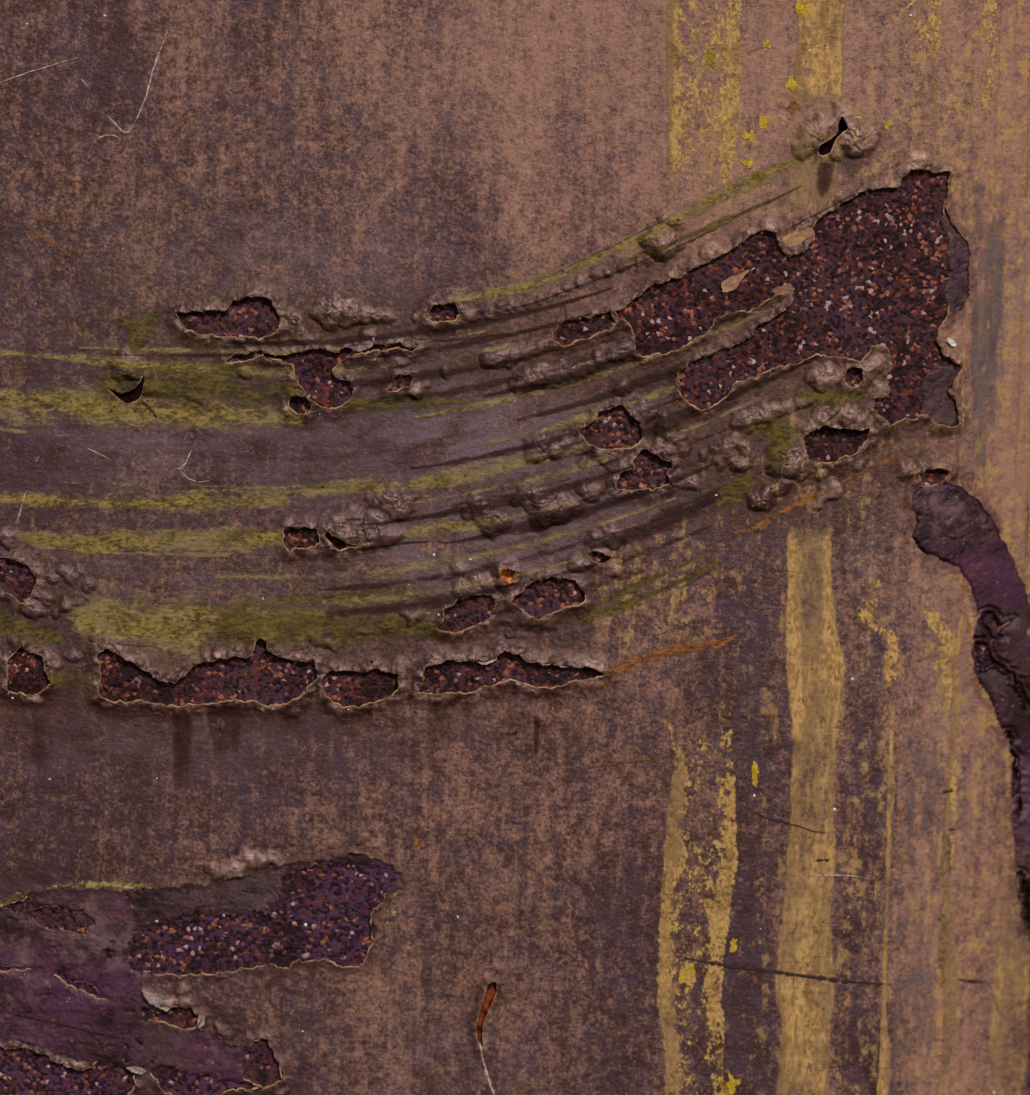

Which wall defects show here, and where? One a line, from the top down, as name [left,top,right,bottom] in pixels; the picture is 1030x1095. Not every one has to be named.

damp [14,526,284,558]
damp [0,347,317,436]
damp [0,579,501,666]
damp [0,443,609,515]
peeling [0,540,625,725]
peeling [270,513,391,569]
peeling [559,381,697,507]
peeling [537,151,979,487]
peeling [0,845,412,1095]
damp [657,704,738,1095]
damp [774,528,846,1095]
peeling [903,455,1030,1095]